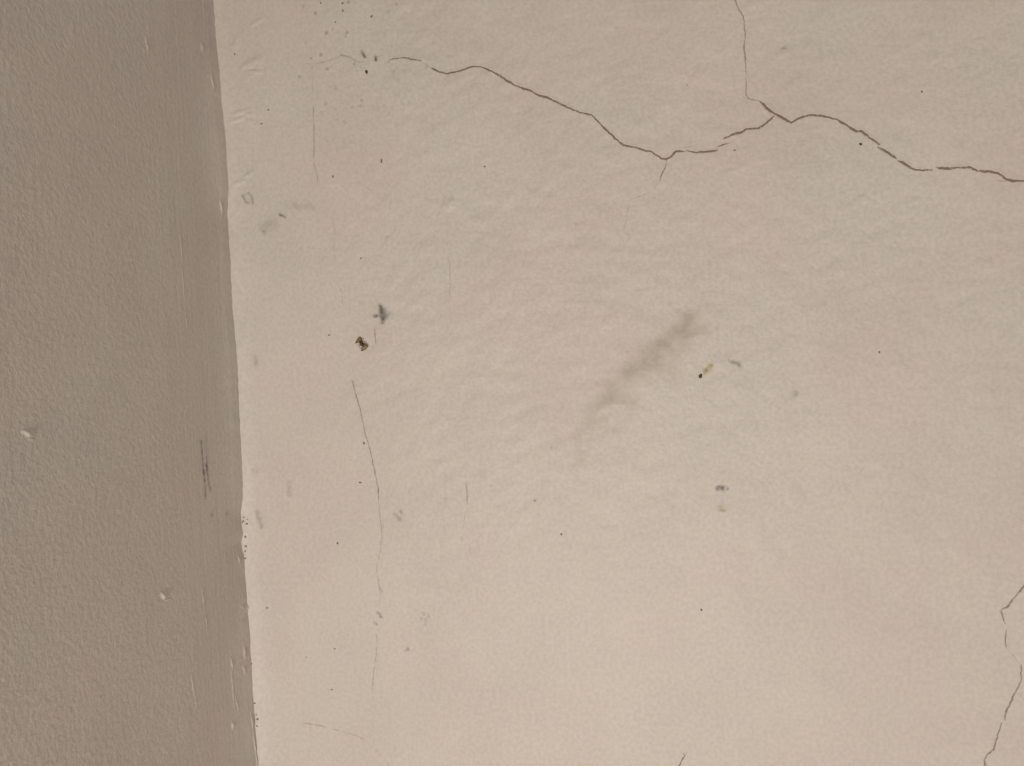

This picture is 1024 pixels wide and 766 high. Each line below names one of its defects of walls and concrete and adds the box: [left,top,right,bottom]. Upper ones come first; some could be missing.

crack [389,55,1024,182]